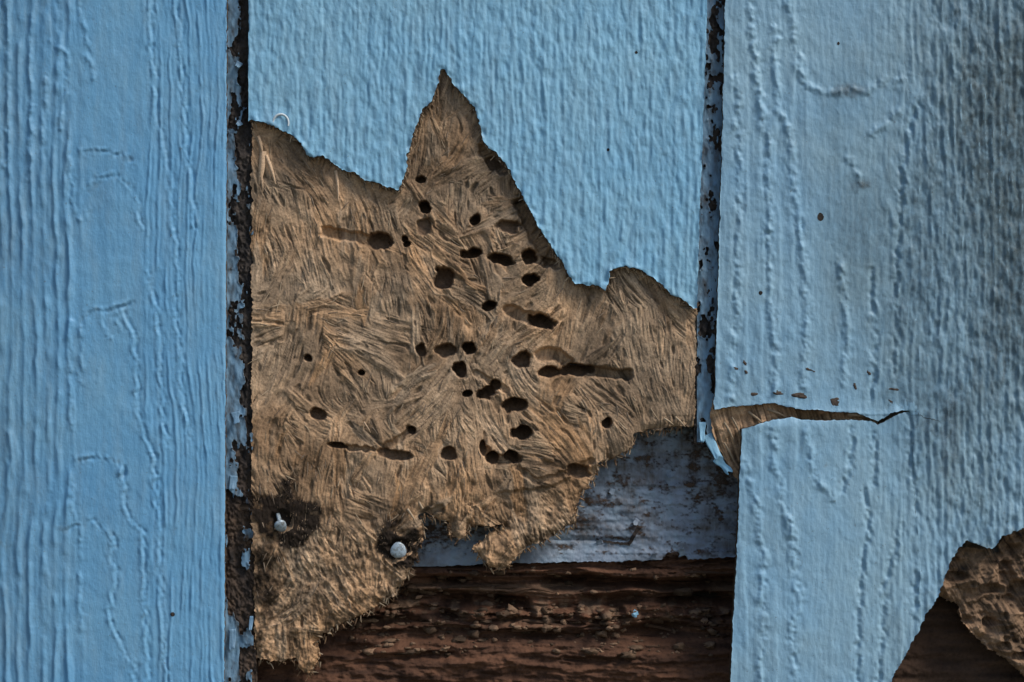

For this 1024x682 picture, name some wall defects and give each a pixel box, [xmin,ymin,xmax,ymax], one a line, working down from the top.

peeling [224,0,738,682]
crack [710,399,940,480]
spalling [892,528,1024,682]